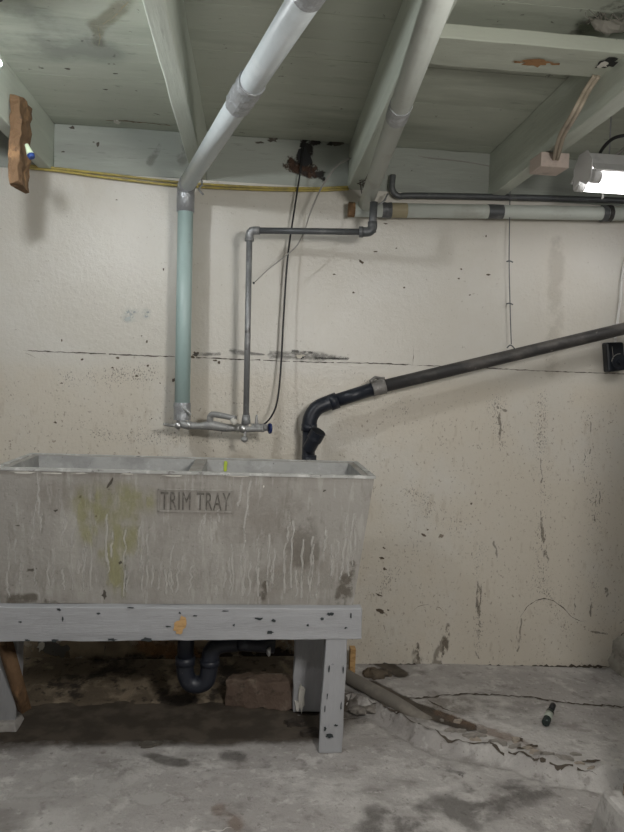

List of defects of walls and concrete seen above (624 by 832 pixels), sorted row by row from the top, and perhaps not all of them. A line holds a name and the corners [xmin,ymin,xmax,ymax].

rust [283,157,318,178]
crack [26,349,174,357]
crack [196,348,433,366]
crack [488,367,619,375]
crack [489,662,606,670]
crack [369,693,624,772]